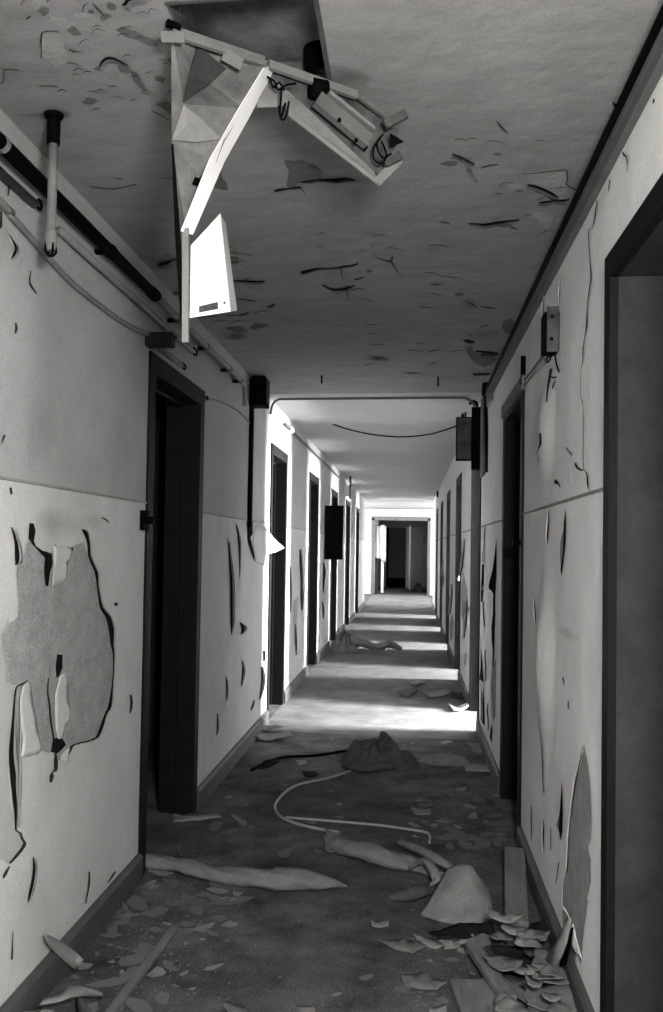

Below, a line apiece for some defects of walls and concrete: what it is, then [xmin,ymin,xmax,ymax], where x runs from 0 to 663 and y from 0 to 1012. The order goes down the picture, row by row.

peeling [38,2,116,76]
peeling [82,26,171,121]
peeling [214,172,228,190]
crack [452,153,499,169]
crack [440,219,519,230]
crack [546,151,628,489]
peeling [228,521,284,634]
peeling [293,549,304,655]
flaking render [441,542,468,641]
peeling [480,528,497,742]
peeling [0,523,118,864]
peeling [556,746,591,963]